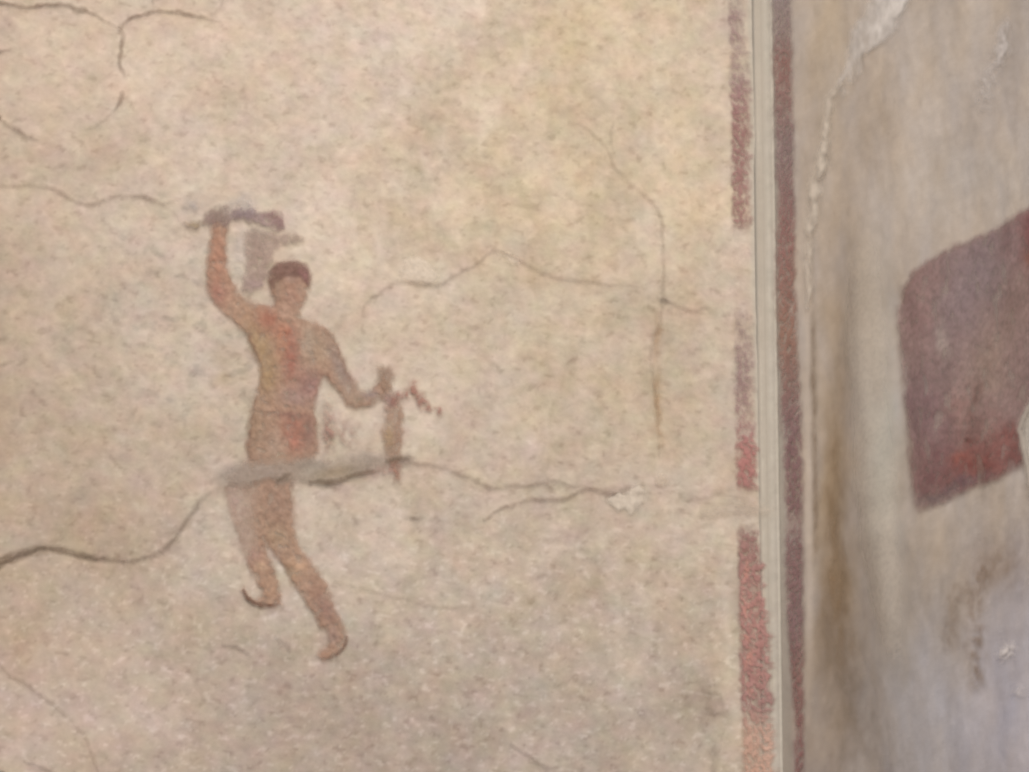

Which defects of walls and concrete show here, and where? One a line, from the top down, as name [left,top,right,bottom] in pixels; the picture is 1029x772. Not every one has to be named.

flaking render [1018,404,1029,481]